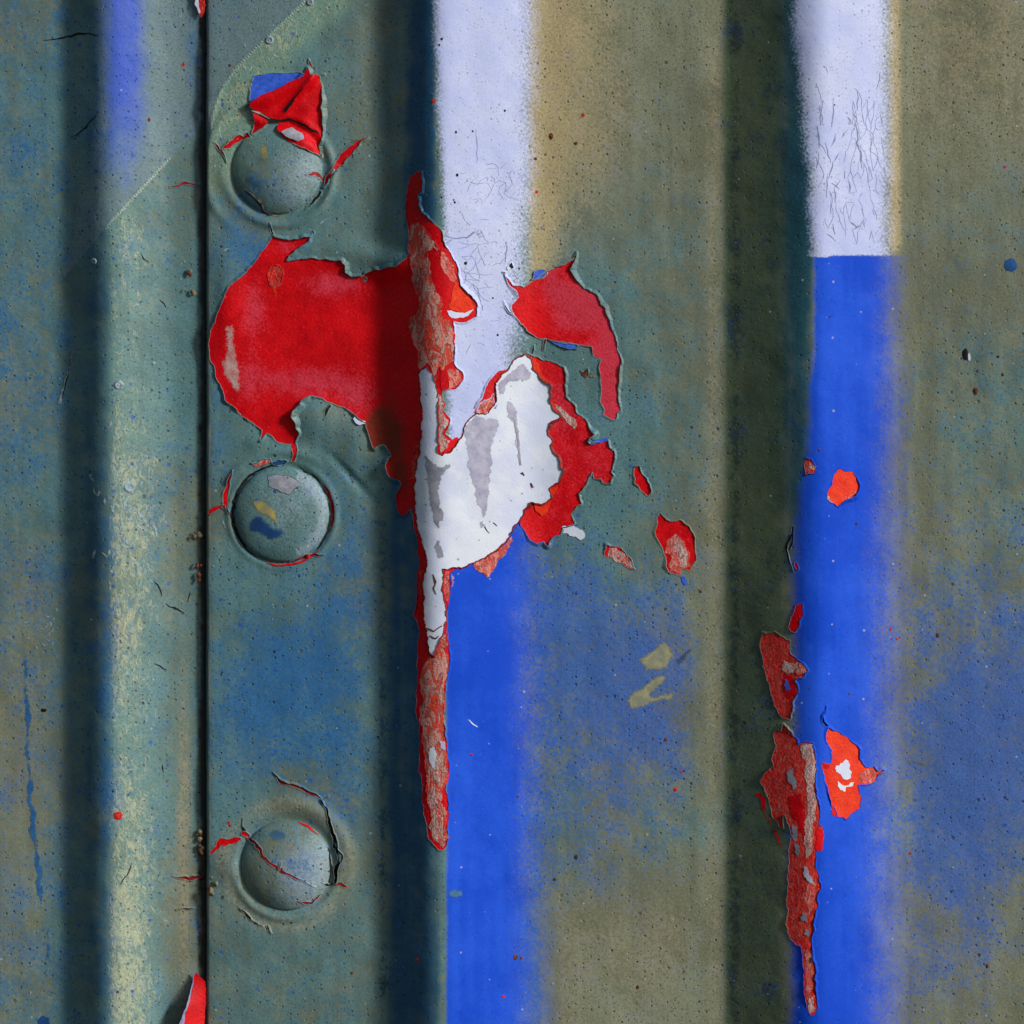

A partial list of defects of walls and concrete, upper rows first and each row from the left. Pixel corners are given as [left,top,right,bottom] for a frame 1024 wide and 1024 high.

peeling [242,58,328,159]
peeling [206,170,624,852]
peeling [631,465,653,497]
peeling [826,468,863,508]
peeling [603,542,636,571]
peeling [652,512,697,585]
crack [172,771,349,911]
peeling [755,602,887,1016]
crack [239,907,273,936]
peeling [179,972,207,1024]